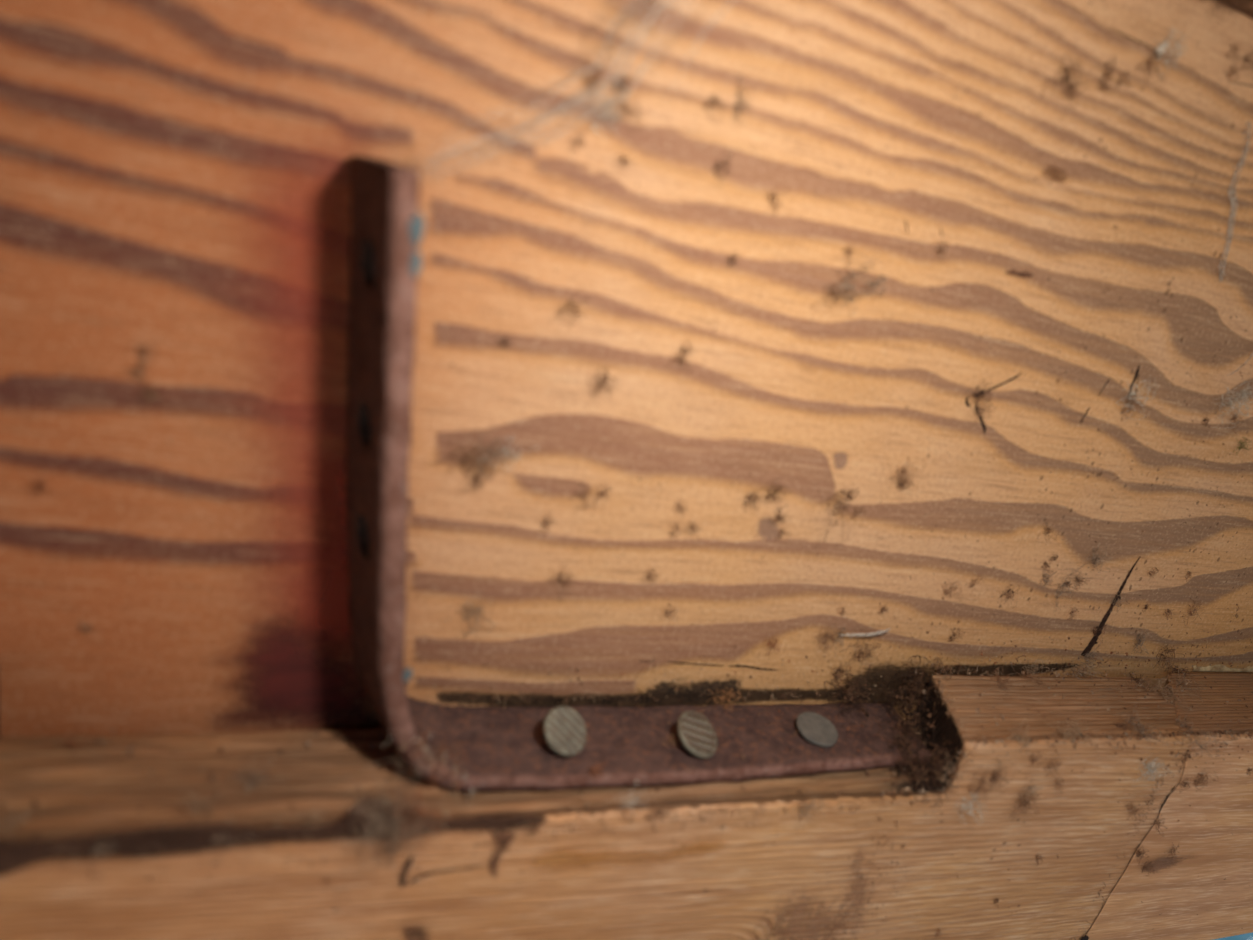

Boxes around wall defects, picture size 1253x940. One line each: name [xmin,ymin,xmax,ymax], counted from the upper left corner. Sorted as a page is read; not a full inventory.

crack [1081,557,1140,657]
water stain [224,626,374,730]
crack [1080,755,1187,940]